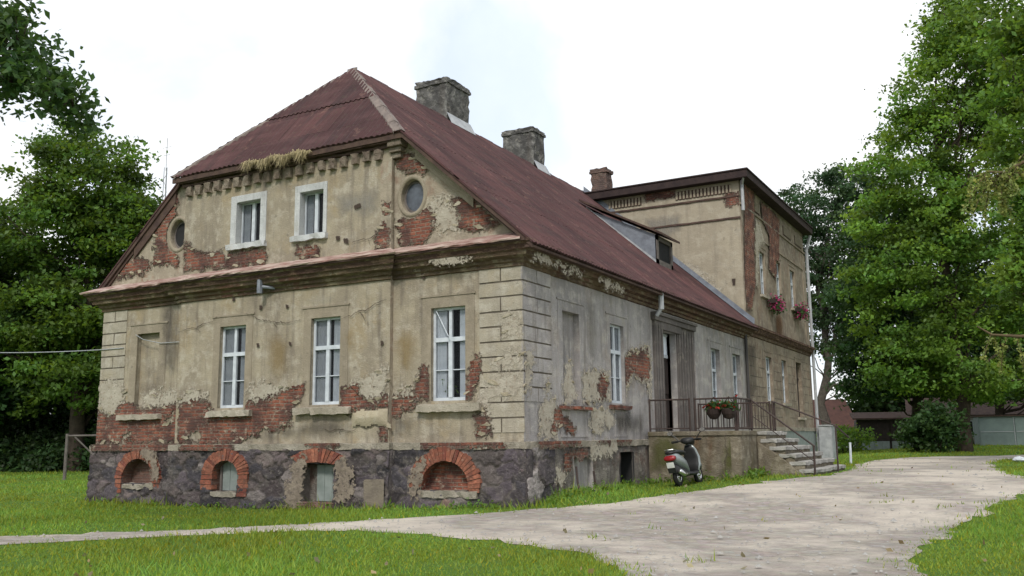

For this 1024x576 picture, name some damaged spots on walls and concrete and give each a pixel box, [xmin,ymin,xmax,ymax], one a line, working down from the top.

flaking render [114,197,269,282]
flaking render [294,243,320,260]
flaking render [372,192,500,250]
flaking render [429,255,473,266]
flaking render [533,252,583,277]
flaking render [598,275,625,295]
flaking render [677,184,780,312]
flaking render [90,377,306,482]
flaking render [338,362,429,443]
flaking render [407,307,527,502]
flaking render [537,355,632,487]
flaking render [625,344,653,409]